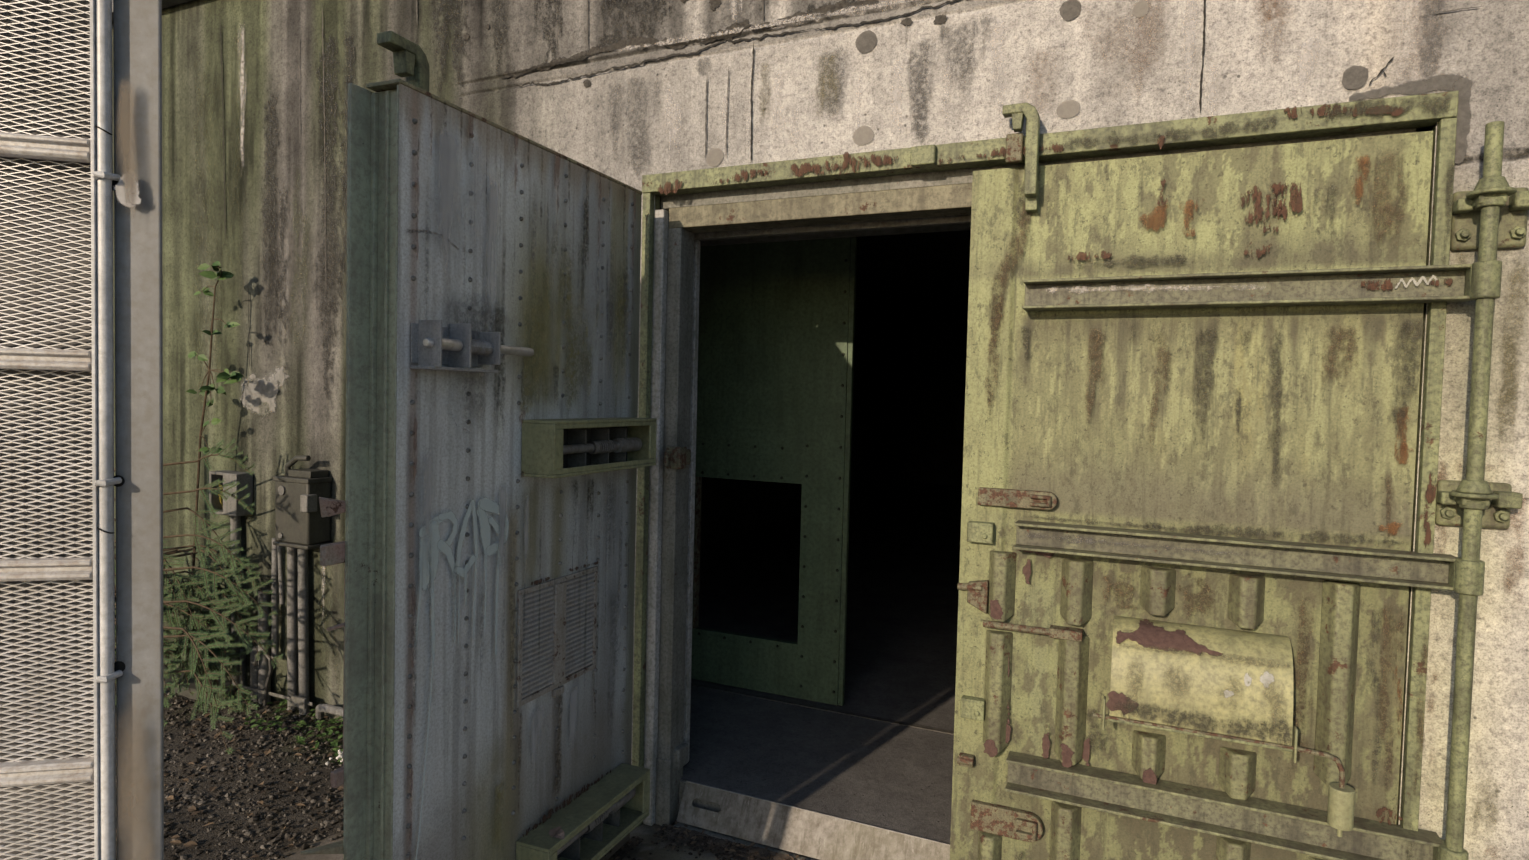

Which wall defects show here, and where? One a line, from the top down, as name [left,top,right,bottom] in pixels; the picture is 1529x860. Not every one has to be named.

leakage [534,0,563,62]
leakage [599,0,672,50]
leakage [945,19,1004,85]
leakage [821,54,860,122]
leakage [892,42,930,140]
leakage [261,93,288,343]
leakage [314,32,355,397]
corrosion [719,168,768,183]
corrosion [790,152,898,177]
corrosion [1238,153,1406,258]
peeling [240,366,289,417]